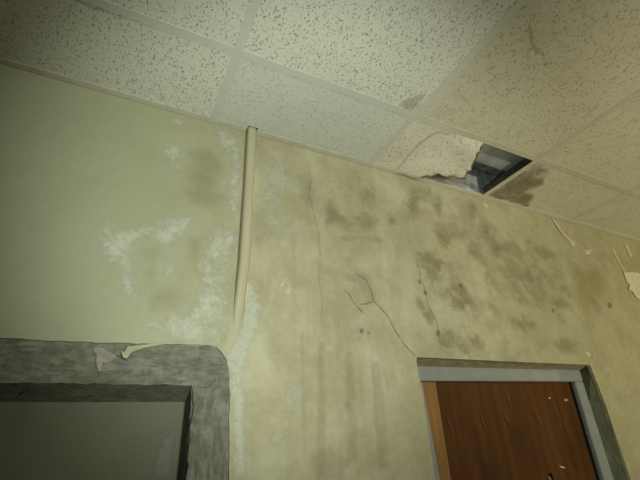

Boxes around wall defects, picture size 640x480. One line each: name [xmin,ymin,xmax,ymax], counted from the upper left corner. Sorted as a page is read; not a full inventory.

damp [490,165,542,207]
damp [103,218,189,290]
damp [148,228,236,341]
peeling [611,247,640,299]
flaking render [0,339,230,480]
damp [228,283,260,475]